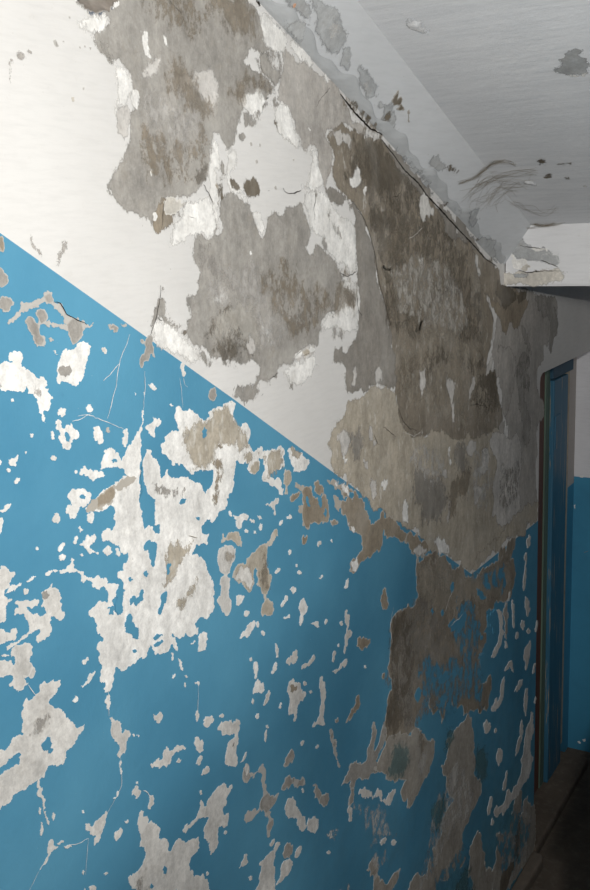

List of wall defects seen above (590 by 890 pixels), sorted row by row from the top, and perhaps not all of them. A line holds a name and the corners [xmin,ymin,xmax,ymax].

peeling [554,48,590,77]
crack [341,94,496,266]
peeling [430,154,459,173]
spalling [504,239,564,287]
flaking render [0,0,430,890]
damp [327,123,558,742]
flaking render [279,534,538,890]